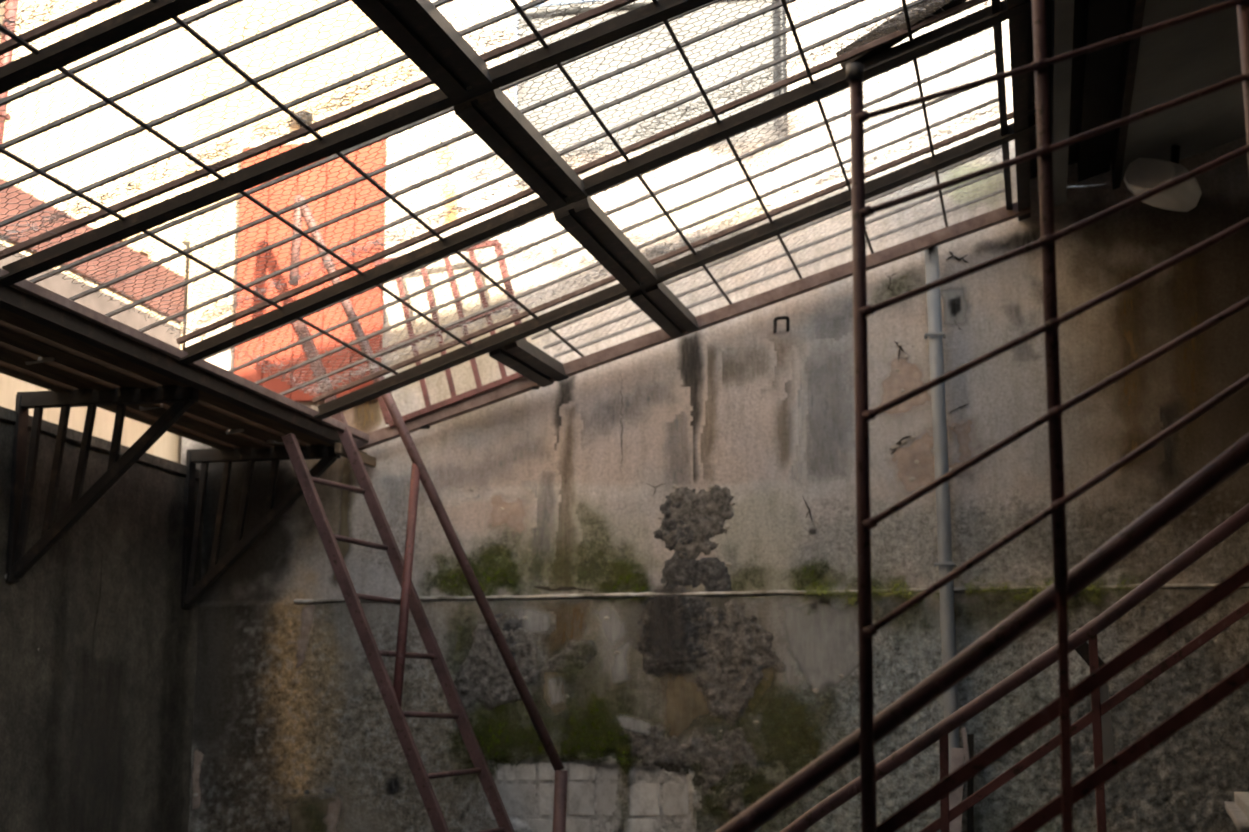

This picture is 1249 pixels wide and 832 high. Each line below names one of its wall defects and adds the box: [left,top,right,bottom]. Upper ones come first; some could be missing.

damp [671,333,742,482]
damp [337,459,352,559]
damp [534,377,613,592]
spalling [454,610,597,713]
damp [548,604,587,651]
spalling [600,484,859,818]